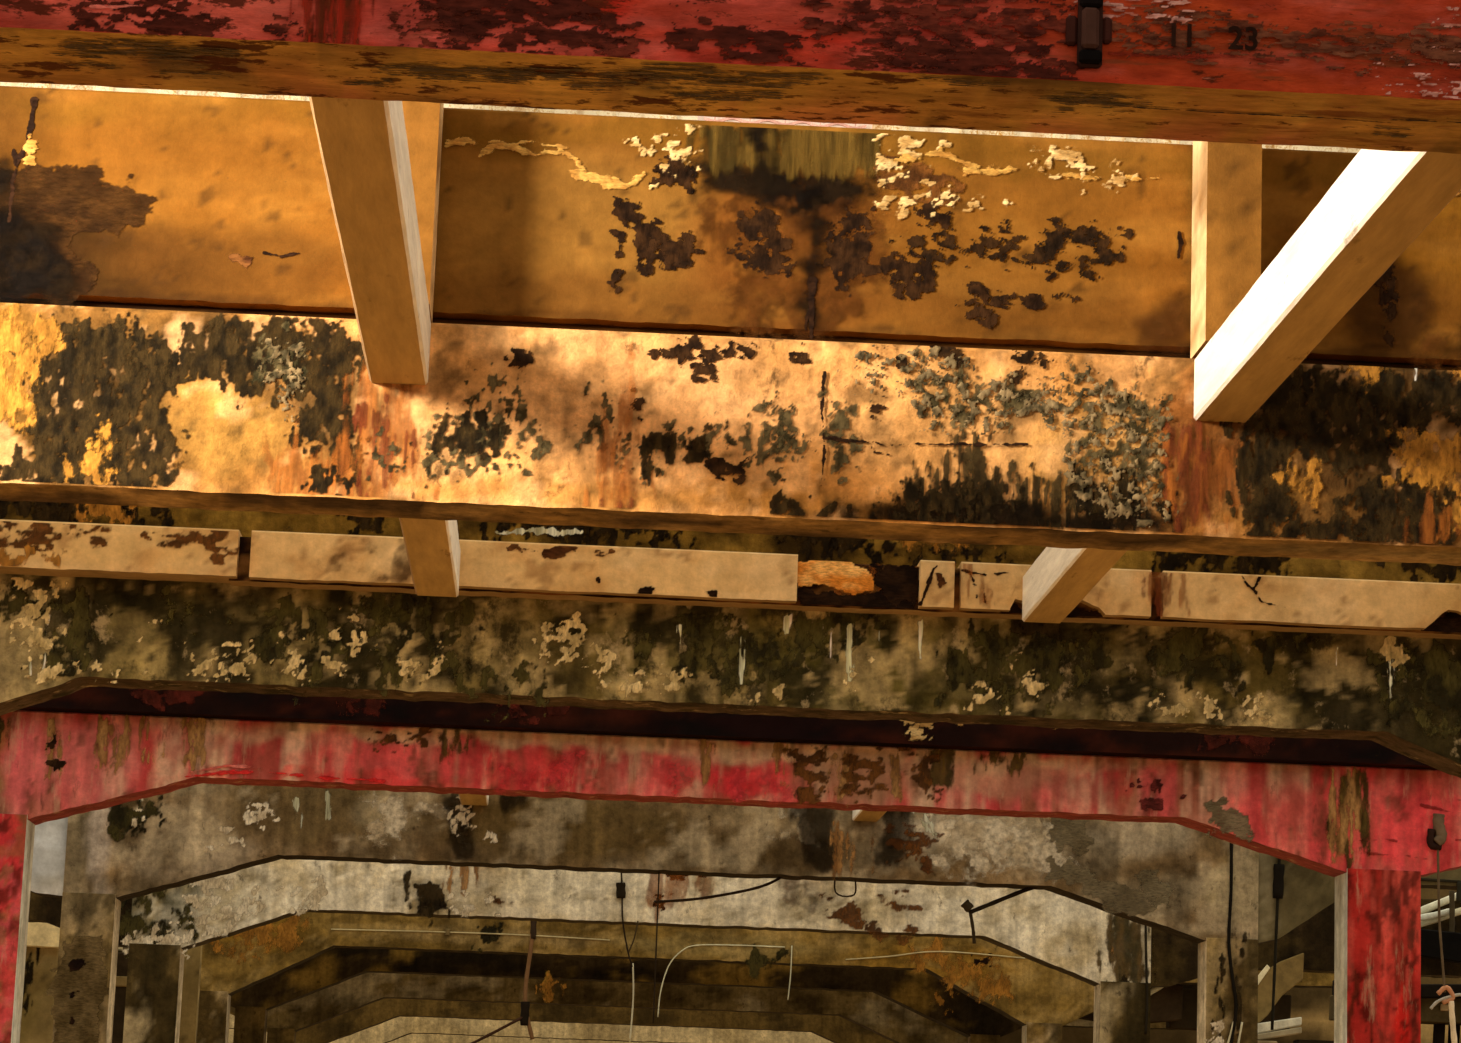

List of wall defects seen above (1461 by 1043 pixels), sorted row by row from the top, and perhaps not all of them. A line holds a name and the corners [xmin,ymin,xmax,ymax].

peeling [65,0,230,37]
peeling [263,0,307,41]
peeling [387,0,1085,85]
peeling [1103,0,1461,99]
peeling [444,137,646,190]
leakage [607,124,1158,339]
leakage [0,159,552,489]
leakage [874,427,1178,533]
leakage [0,500,240,684]
spalling [797,560,947,609]
leakage [184,609,377,682]
leakage [532,611,693,698]